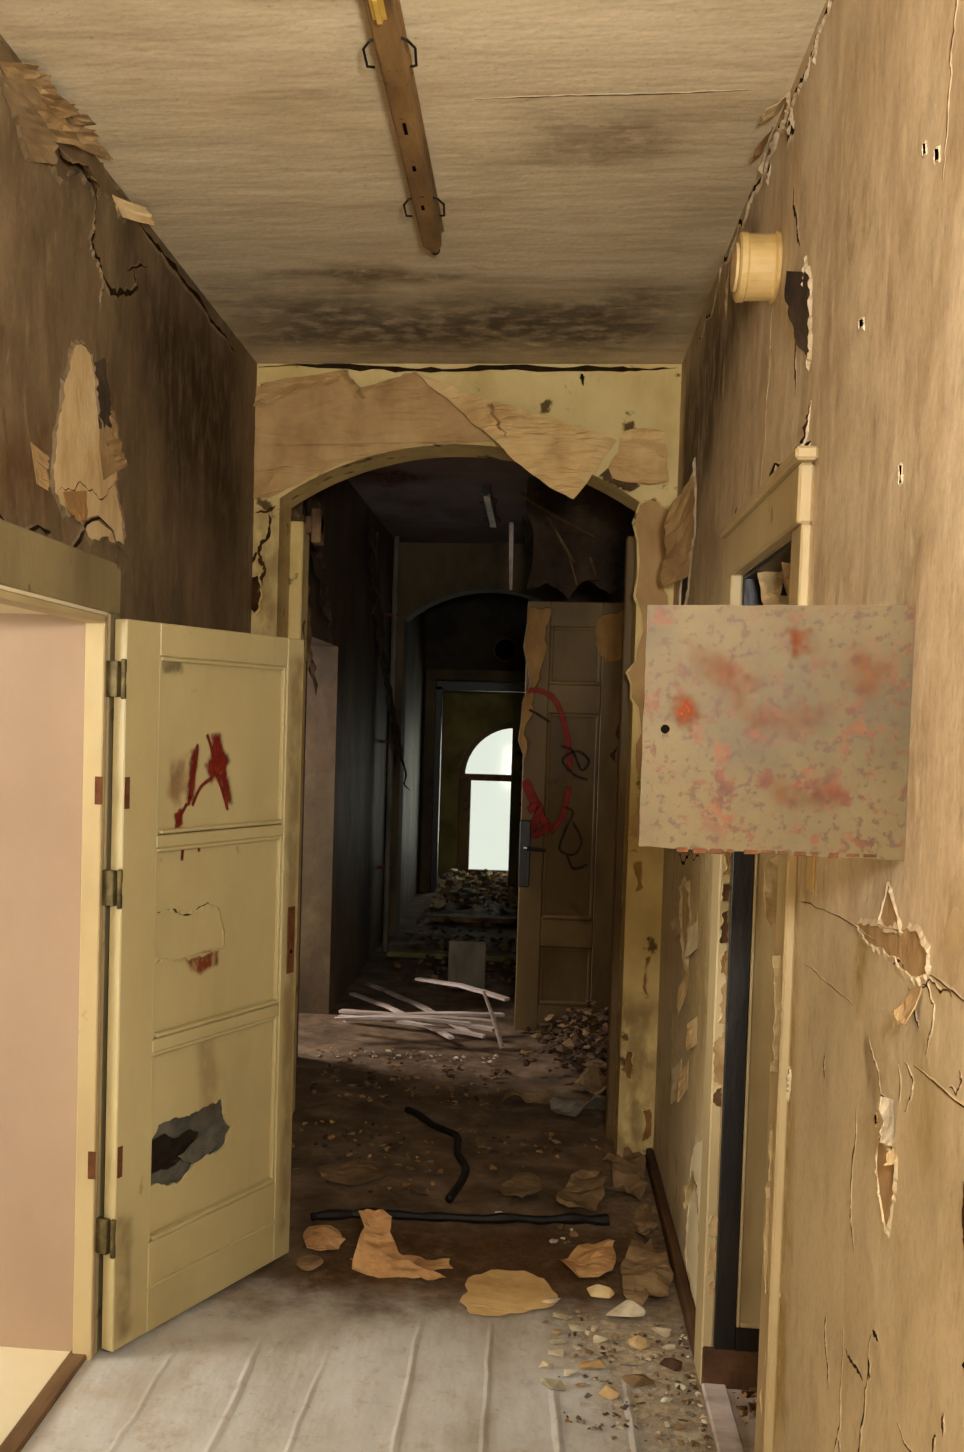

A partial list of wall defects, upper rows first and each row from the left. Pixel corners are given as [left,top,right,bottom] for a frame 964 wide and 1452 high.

crack [942,0,959,181]
crack [88,0,834,386]
damp [385,314,616,339]
flaking render [31,339,128,548]
crack [0,514,128,558]
peeling [626,498,669,840]
peeling [632,860,644,893]
flaking render [855,917,952,1054]
flaking render [868,1036,915,1238]
flaking render [949,1070,963,1098]
crack [824,1312,946,1452]